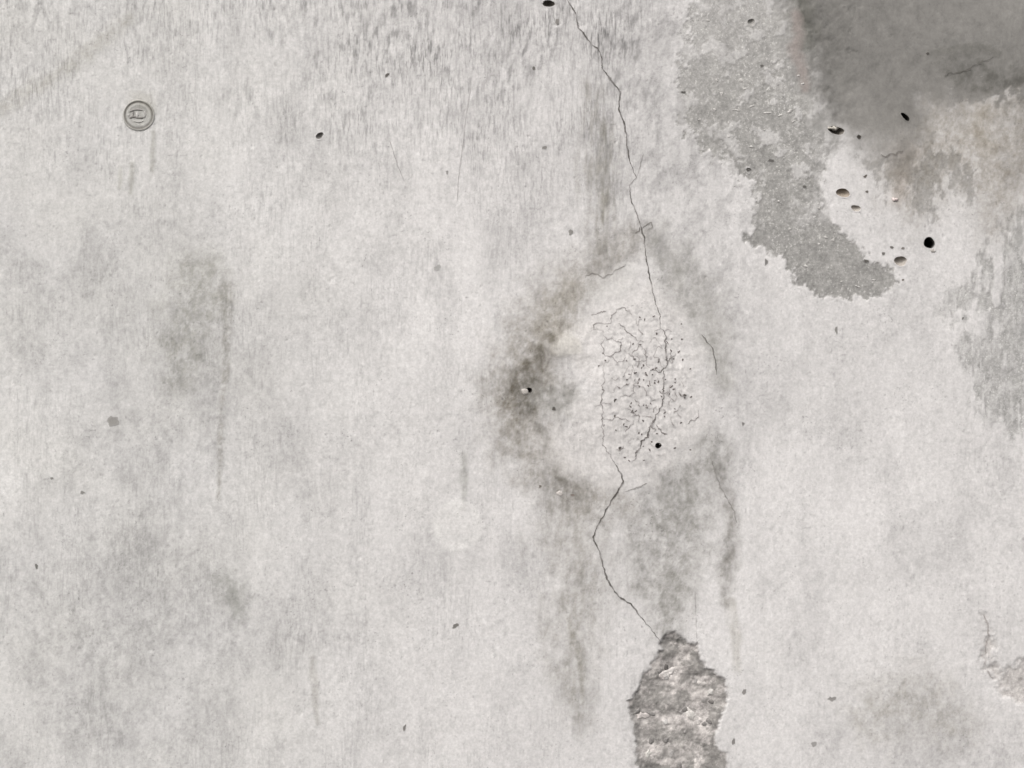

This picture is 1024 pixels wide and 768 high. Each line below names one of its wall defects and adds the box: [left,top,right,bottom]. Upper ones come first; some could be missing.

damp [456,73,753,743]
crack [567,0,717,642]
peeling [657,0,1024,476]
damp [768,0,1024,176]
spalling [626,629,746,768]